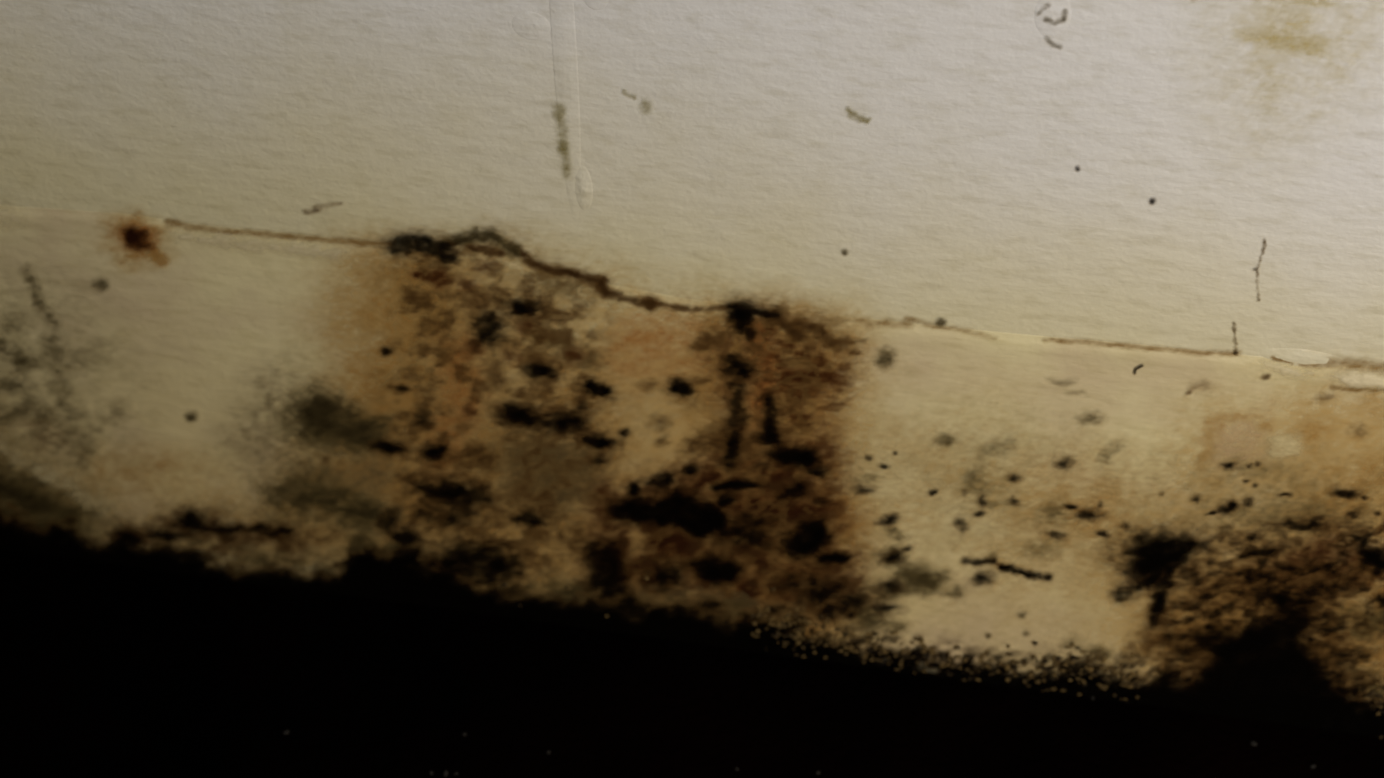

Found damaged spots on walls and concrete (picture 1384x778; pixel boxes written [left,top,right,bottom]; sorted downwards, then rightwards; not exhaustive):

corrosion [117,215,168,266]
water stain [0,228,1384,739]